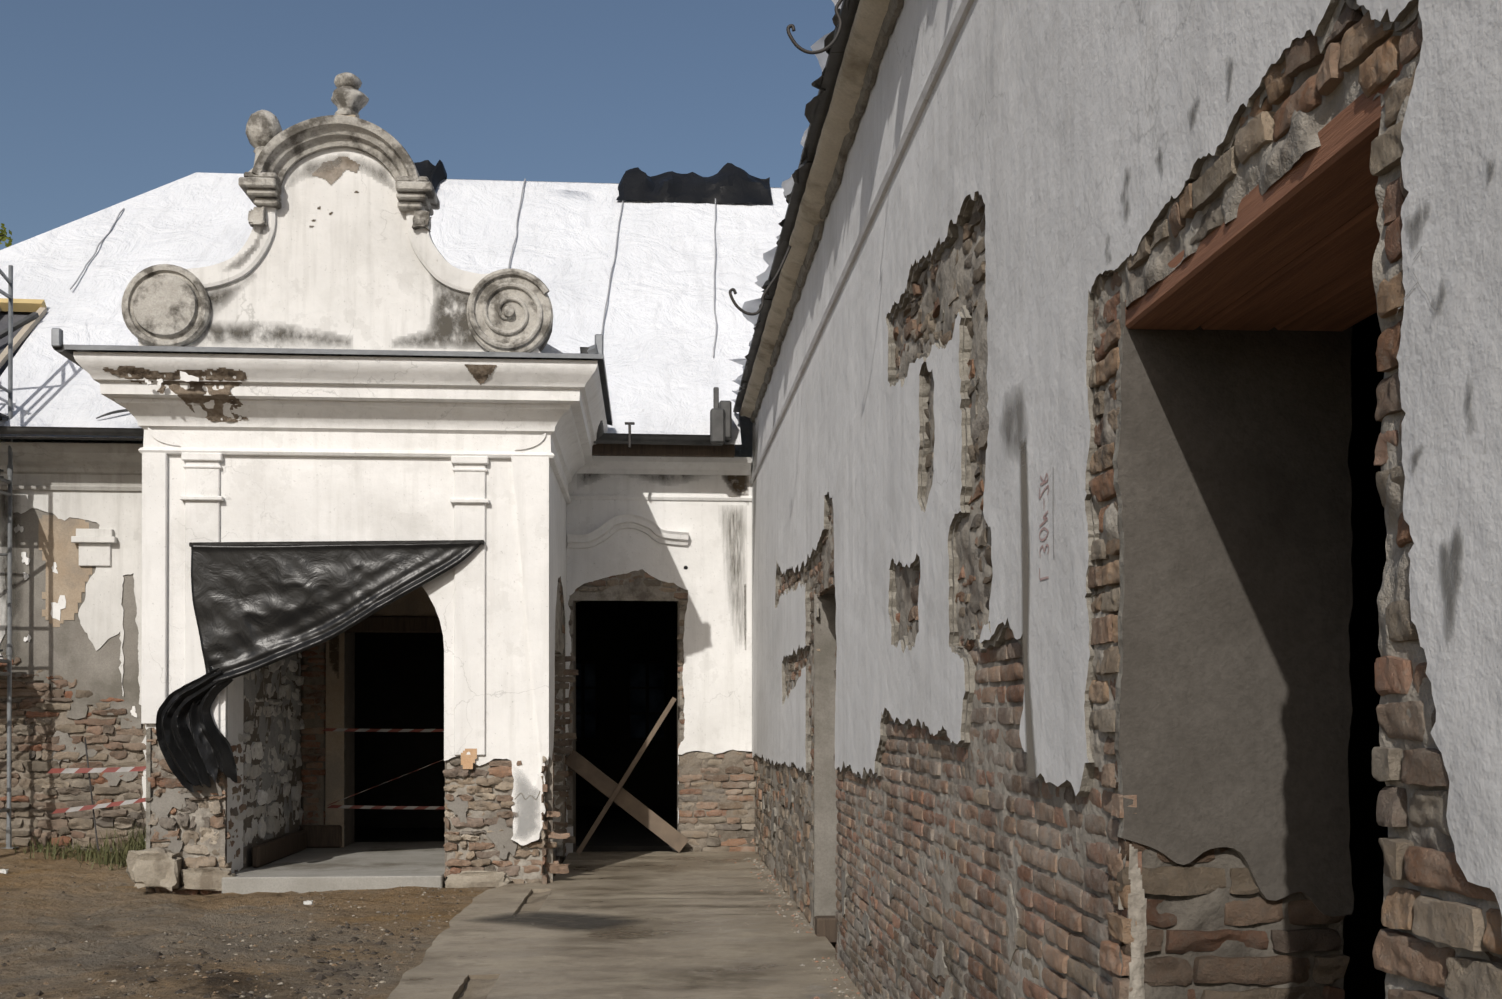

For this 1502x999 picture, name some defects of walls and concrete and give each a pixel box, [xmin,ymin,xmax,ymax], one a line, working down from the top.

spalling [103,366,248,422]
spalling [465,364,497,385]
flaking render [834,4,1502,999]
flaking render [0,508,326,895]
flaking render [443,497,837,930]